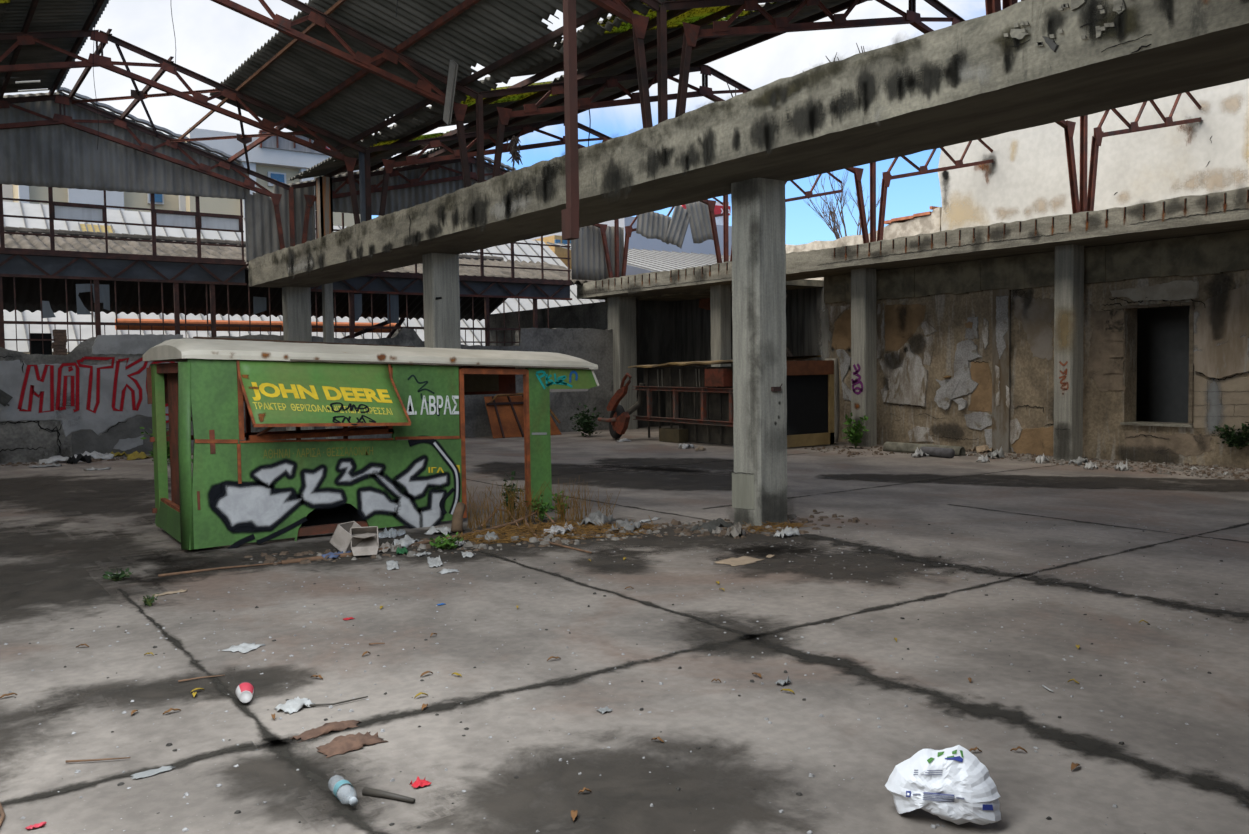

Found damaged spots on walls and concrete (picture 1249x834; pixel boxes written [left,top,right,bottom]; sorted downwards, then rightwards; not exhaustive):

water stain [1044,10,1063,37]
water stain [1079,0,1139,40]
water stain [996,27,1029,71]
water stain [732,39,987,152]
peeling [877,295,1054,456]